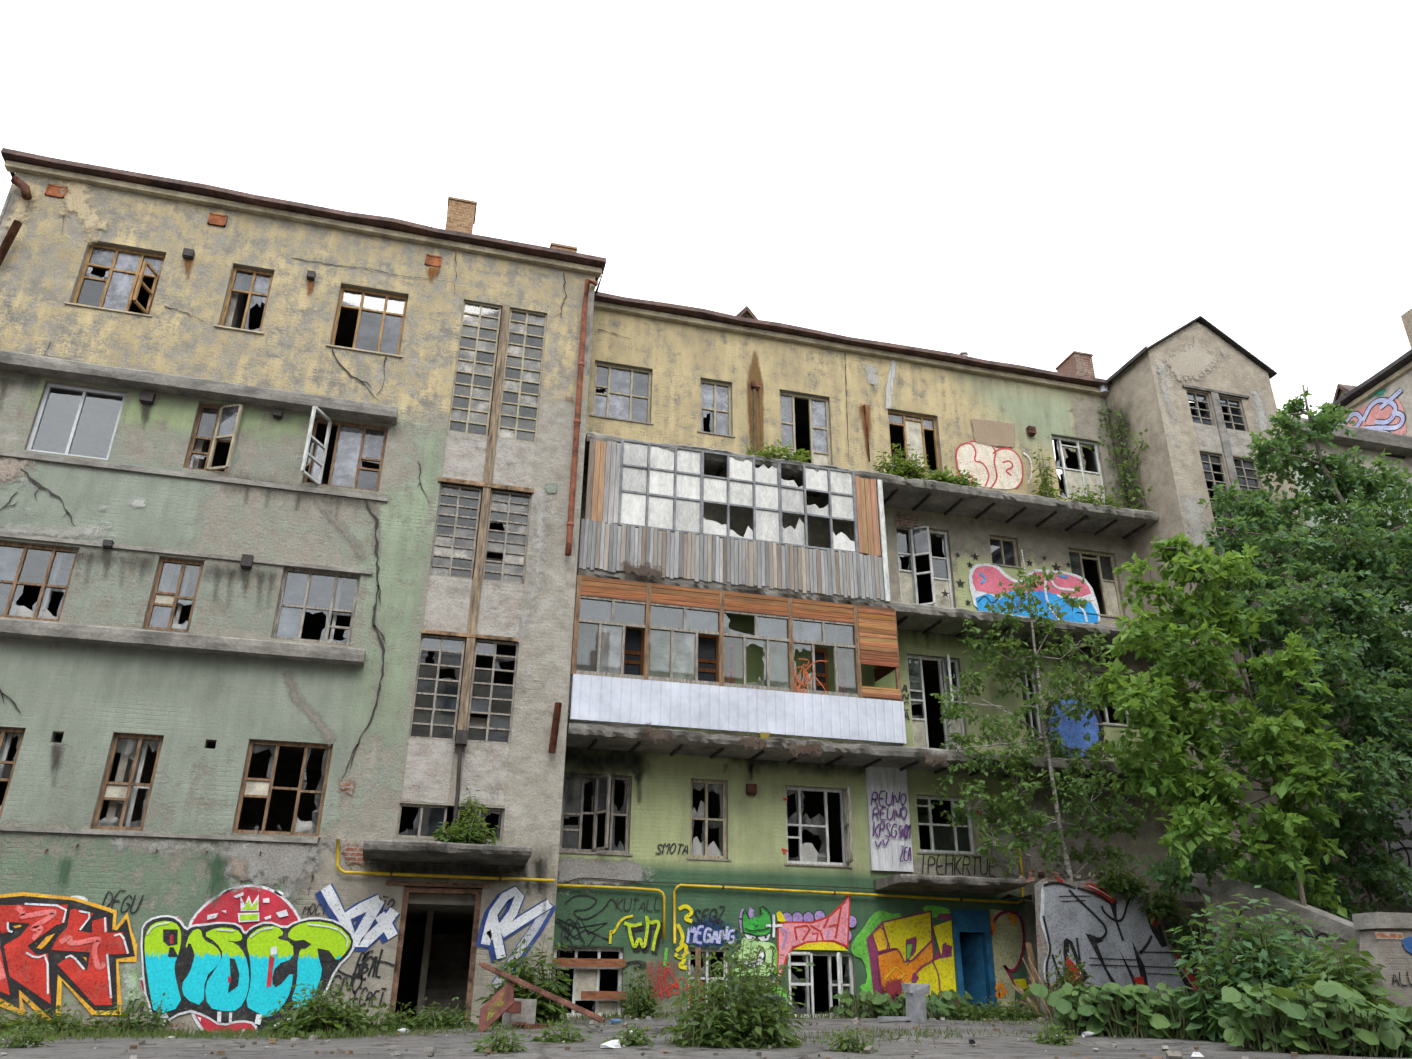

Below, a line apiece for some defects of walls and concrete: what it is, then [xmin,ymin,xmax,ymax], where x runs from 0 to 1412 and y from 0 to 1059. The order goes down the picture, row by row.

crack [332,348,387,400]
flaking render [0,449,36,488]
crack [0,469,75,526]
crack [284,499,385,780]
crack [0,689,21,713]